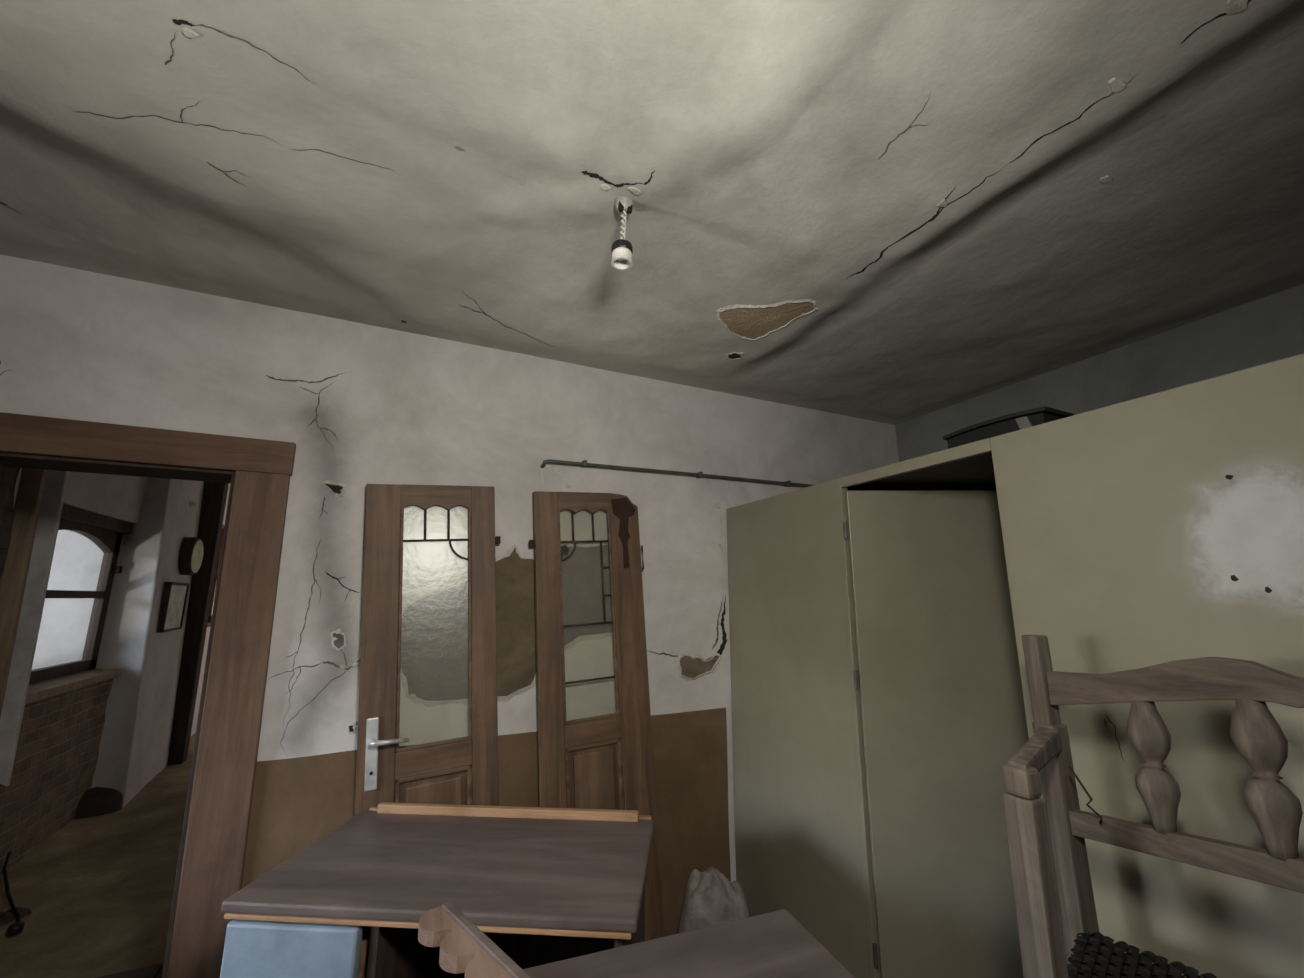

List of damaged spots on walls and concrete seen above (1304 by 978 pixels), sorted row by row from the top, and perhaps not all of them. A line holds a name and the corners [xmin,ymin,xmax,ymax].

crack [165,19,315,84]
crack [1181,0,1251,44]
crack [76,101,403,176]
crack [581,170,655,195]
crack [848,75,1136,278]
spalling [716,299,819,360]
crack [266,372,346,452]
crack [268,496,360,752]
spalling [400,575,469,707]
spalling [495,544,537,702]
spalling [561,542,613,651]
spalling [650,594,728,681]